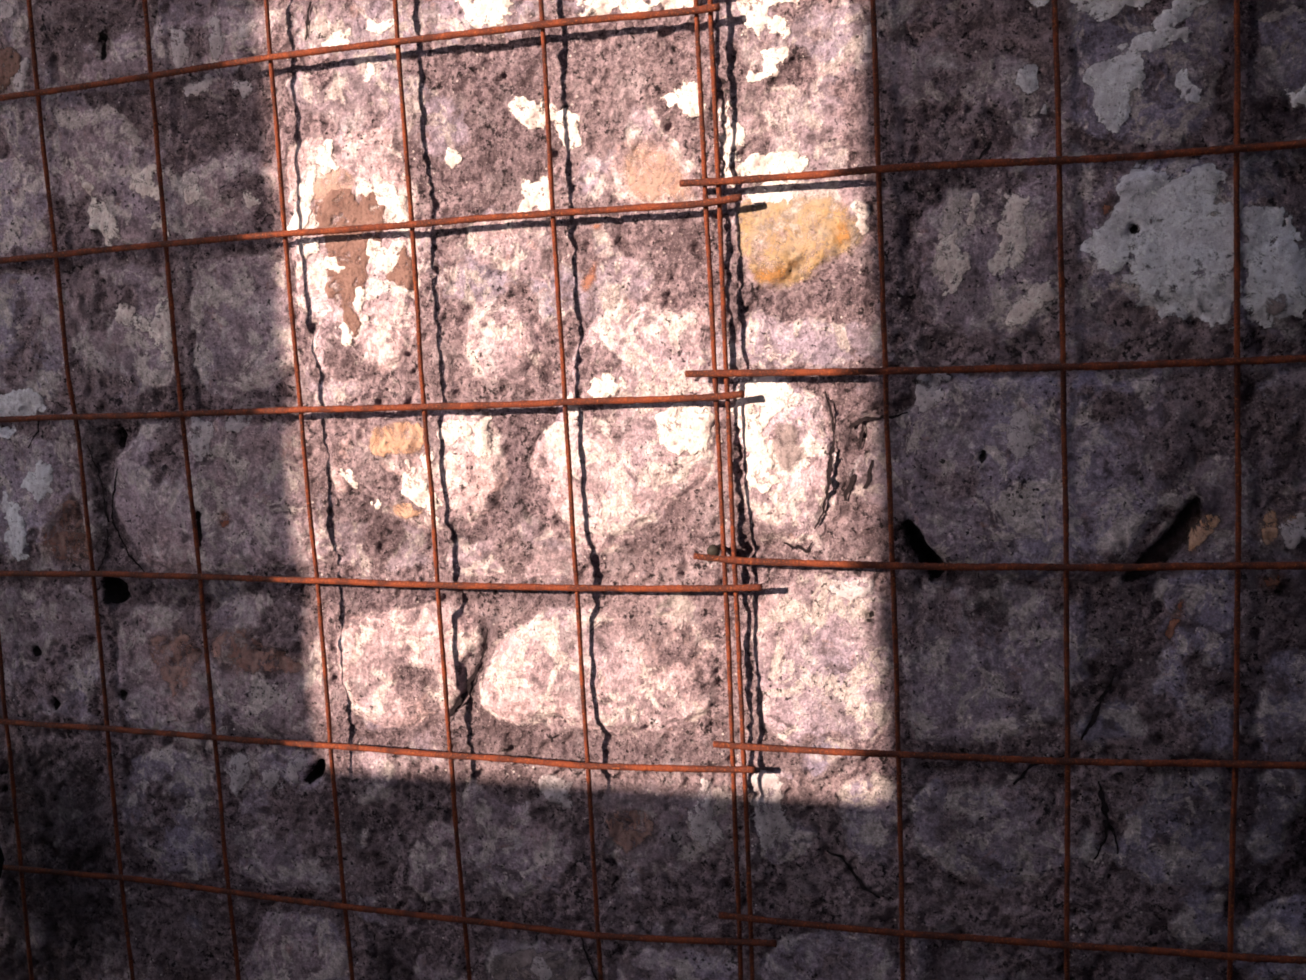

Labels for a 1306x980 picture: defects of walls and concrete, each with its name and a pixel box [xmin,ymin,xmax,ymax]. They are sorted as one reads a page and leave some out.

rust [737,196,860,286]
crack [784,391,908,553]